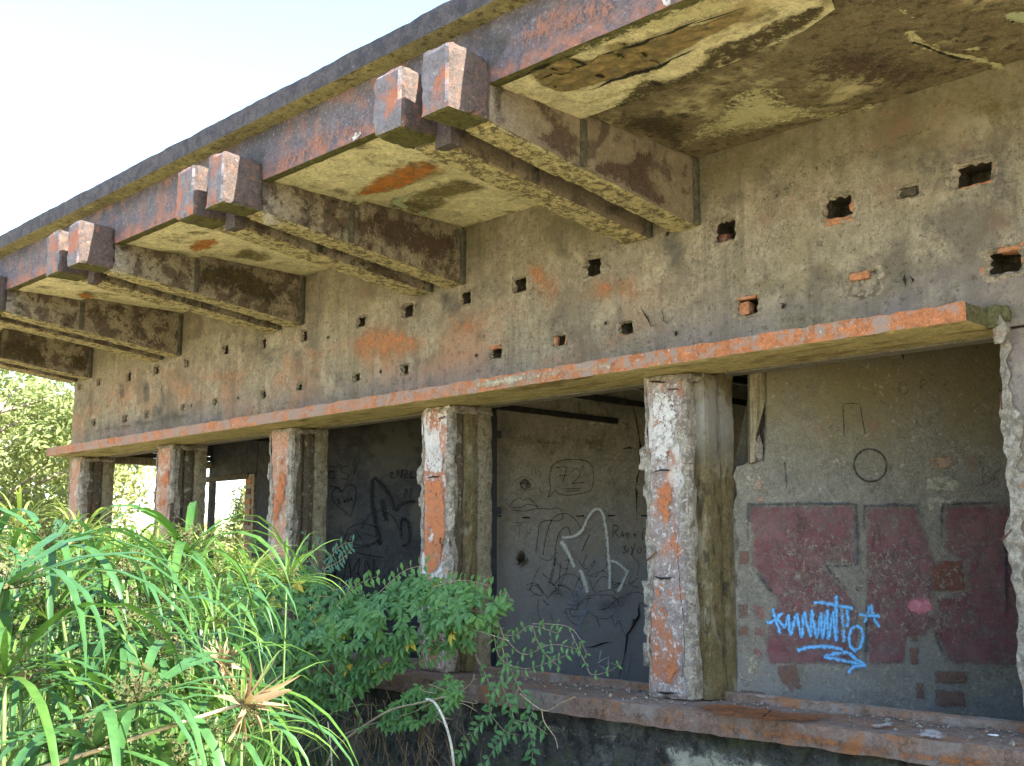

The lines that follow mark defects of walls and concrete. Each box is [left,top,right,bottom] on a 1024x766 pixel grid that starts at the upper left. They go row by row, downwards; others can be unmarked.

damp [495,86,504,112]
damp [526,96,578,160]
crack [528,7,745,90]
damp [558,0,878,147]
damp [809,44,945,89]
corrosion [351,162,446,205]
spalling [945,155,999,194]
corrosion [190,239,217,251]
peeling [416,410,458,615]
spalling [639,378,703,699]
spalling [985,304,1024,704]
corrosion [700,704,885,757]